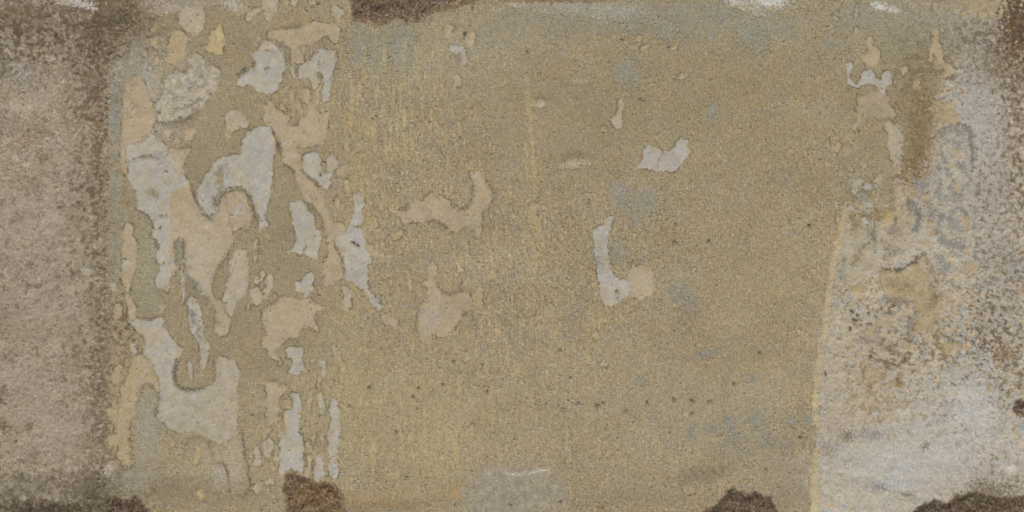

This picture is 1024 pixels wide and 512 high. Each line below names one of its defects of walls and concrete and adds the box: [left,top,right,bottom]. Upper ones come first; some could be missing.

peeling [636,137,692,172]
peeling [101,0,504,512]
peeling [592,216,655,308]